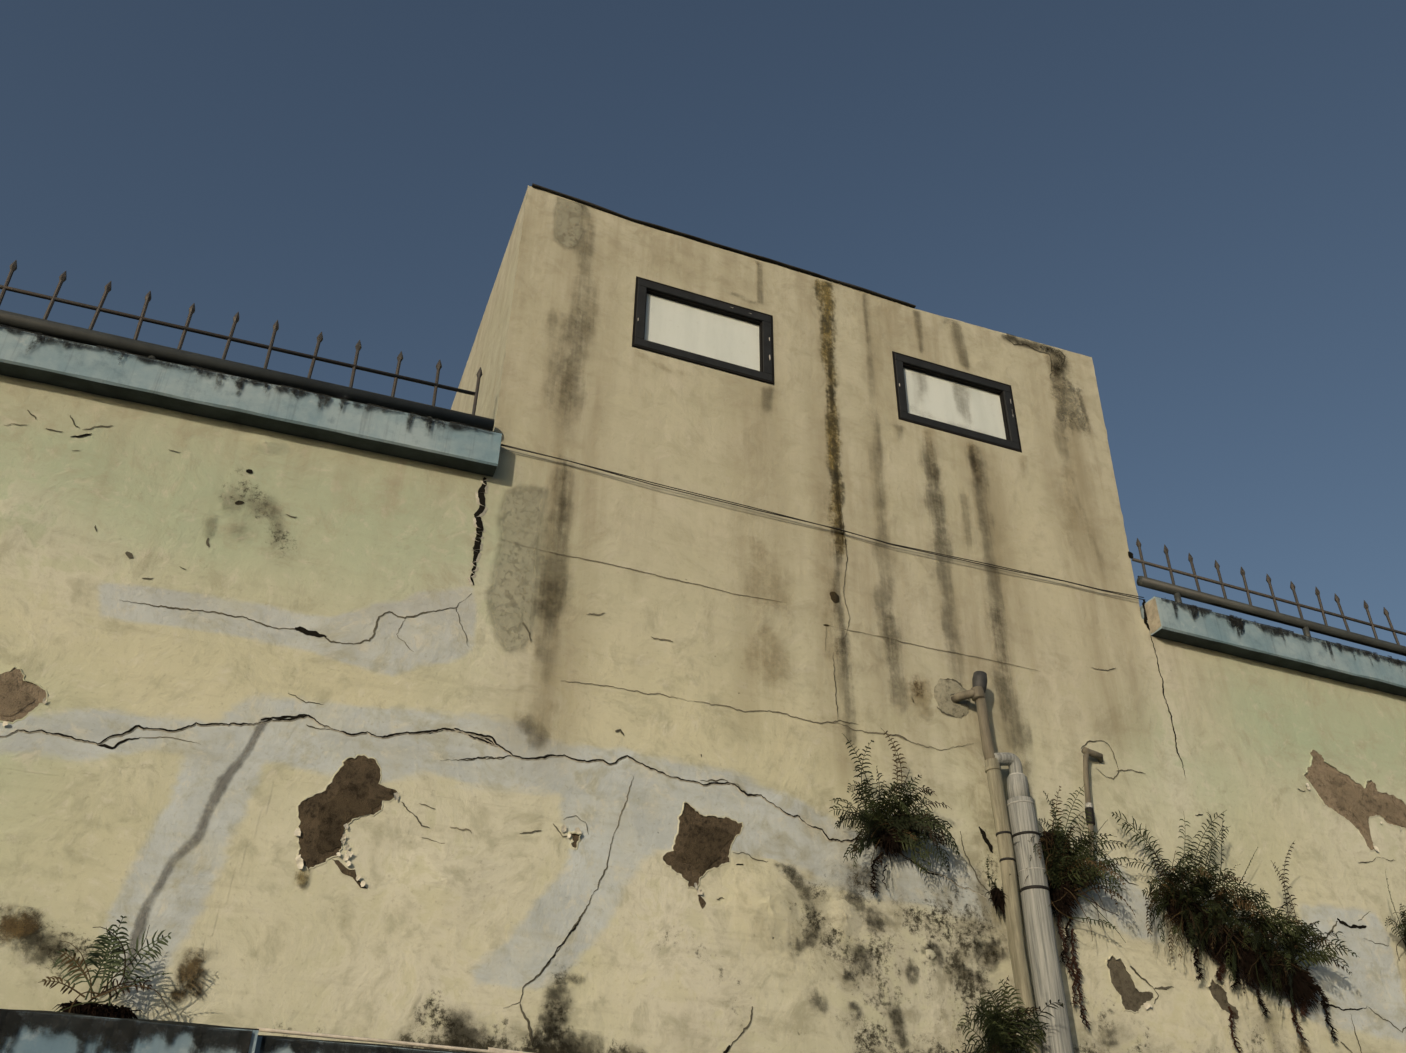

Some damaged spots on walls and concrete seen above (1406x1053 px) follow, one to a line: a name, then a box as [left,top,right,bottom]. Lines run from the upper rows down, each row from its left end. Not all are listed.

water stain [815,280,844,554]
crack [125,477,787,651]
crack [1128,551,1186,778]
spalling [294,754,400,888]
crack [0,693,993,1053]
spalling [661,801,744,909]
spalling [1303,749,1406,852]
water stain [0,1009,484,1053]
water stain [532,977,599,1053]
mould [906,939,1004,982]
spalling [1105,955,1155,1014]
crack [1306,911,1406,1053]